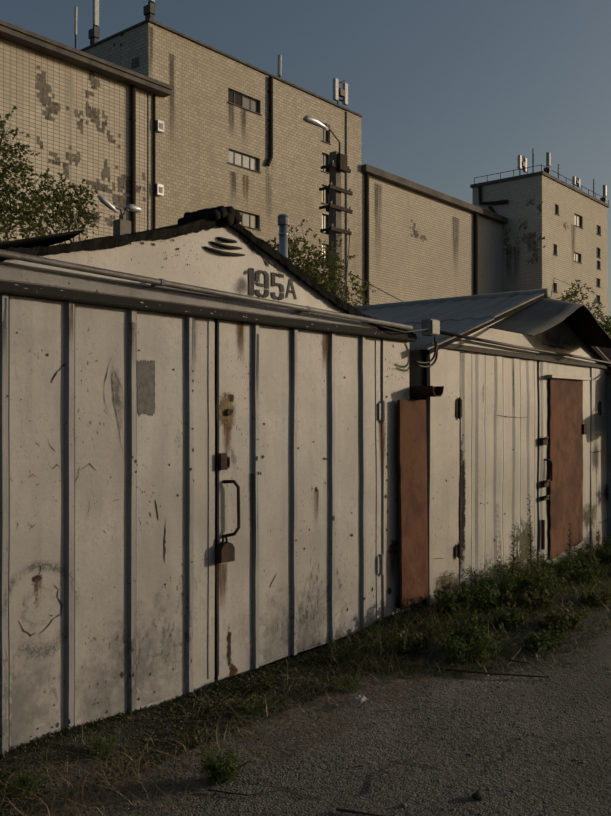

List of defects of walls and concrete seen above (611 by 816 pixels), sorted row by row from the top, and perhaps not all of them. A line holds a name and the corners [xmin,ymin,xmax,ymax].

spalling [36,66,121,148]
spalling [36,136,81,179]
spalling [77,159,146,227]
spalling [504,220,545,264]
rust [217,393,235,446]
rust [227,627,238,676]